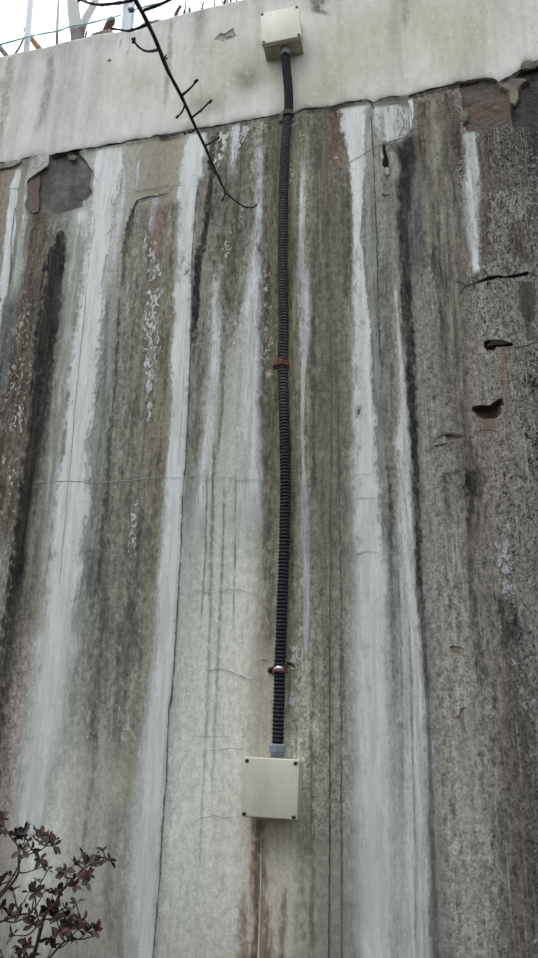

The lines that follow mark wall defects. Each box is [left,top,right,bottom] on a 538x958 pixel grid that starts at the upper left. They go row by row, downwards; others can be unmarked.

spalling [458,60,538,131]
spalling [0,152,94,215]
crack [0,65,538,359]
leakage [519,282,535,326]
peeling [433,432,466,446]
spalling [472,280,538,474]
leakage [0,121,278,958]
crack [38,184,260,958]
leakage [285,94,490,958]
leakage [498,602,518,638]
rust [239,822,286,958]